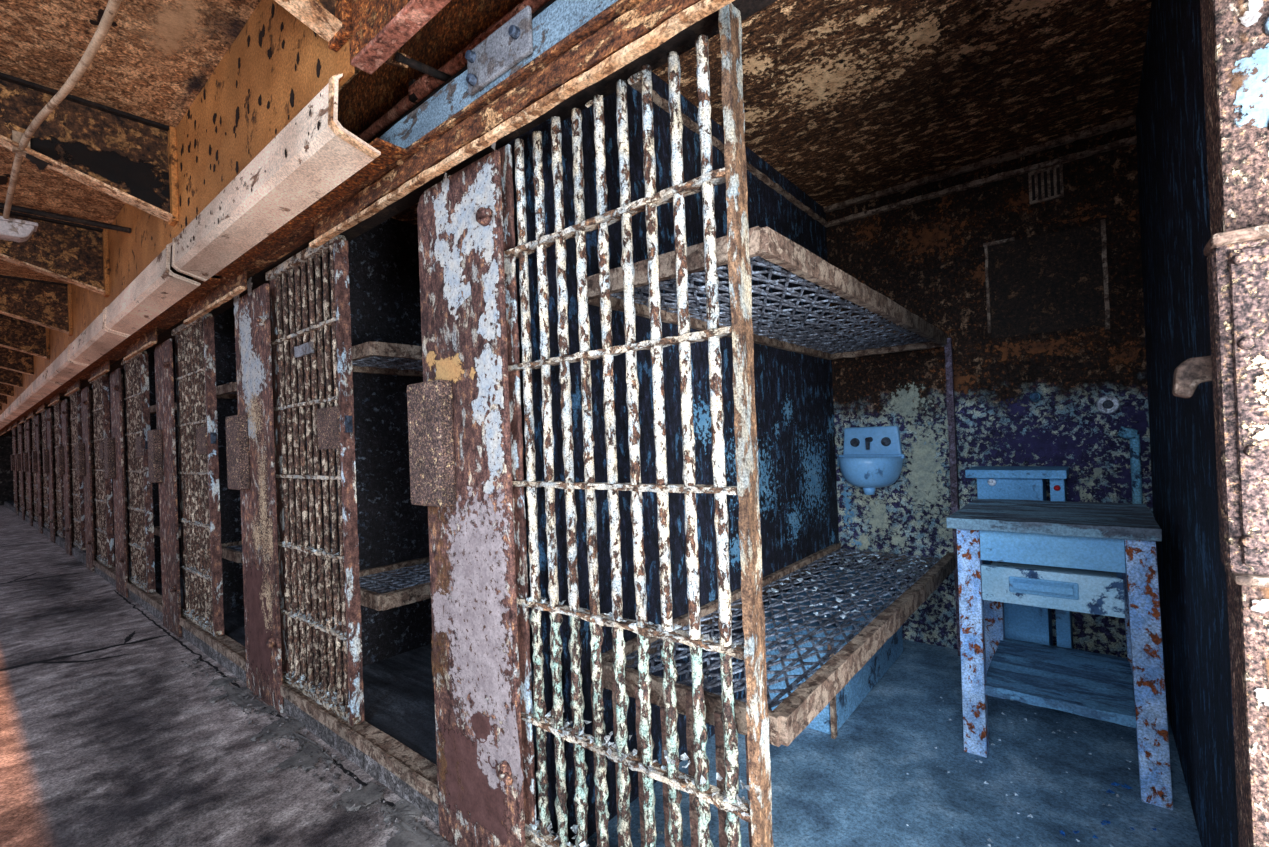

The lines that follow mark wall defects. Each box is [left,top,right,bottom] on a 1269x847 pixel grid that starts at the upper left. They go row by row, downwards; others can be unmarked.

peeling [1232,43,1269,128]
peeling [426,142,751,816]
corrosion [244,560,276,685]
peeling [1251,599,1269,614]
peeling [1254,687,1269,706]